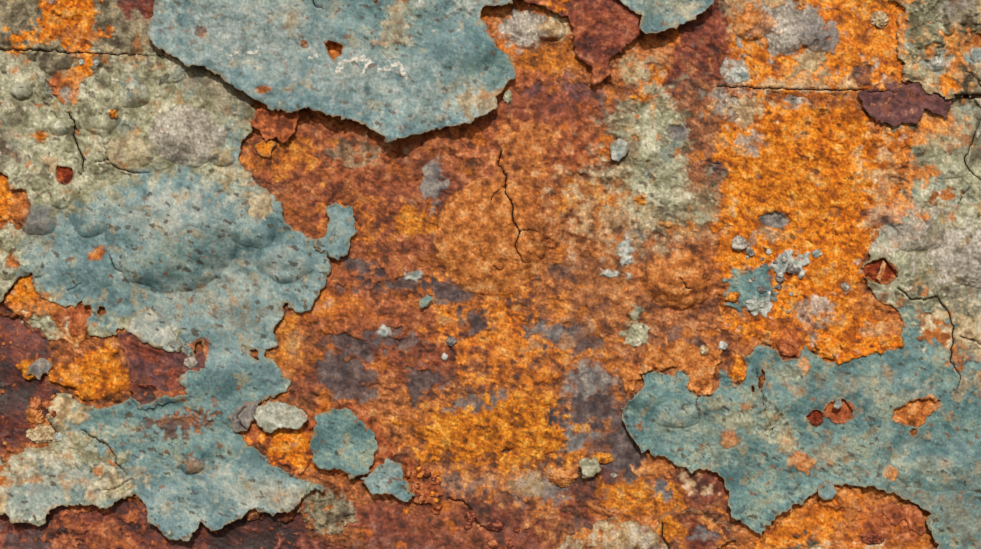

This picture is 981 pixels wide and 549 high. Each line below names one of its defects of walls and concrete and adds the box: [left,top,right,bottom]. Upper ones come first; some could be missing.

rust [521,0,641,85]
rust [0,274,206,405]
peeling [0,0,516,541]
rust [250,105,301,157]
crack [489,150,539,271]
rust [615,0,981,397]
peeling [621,98,981,549]
crack [898,288,981,390]
crack [958,120,981,208]
rust [0,496,168,549]
rust [243,381,573,549]
rust [555,487,933,549]